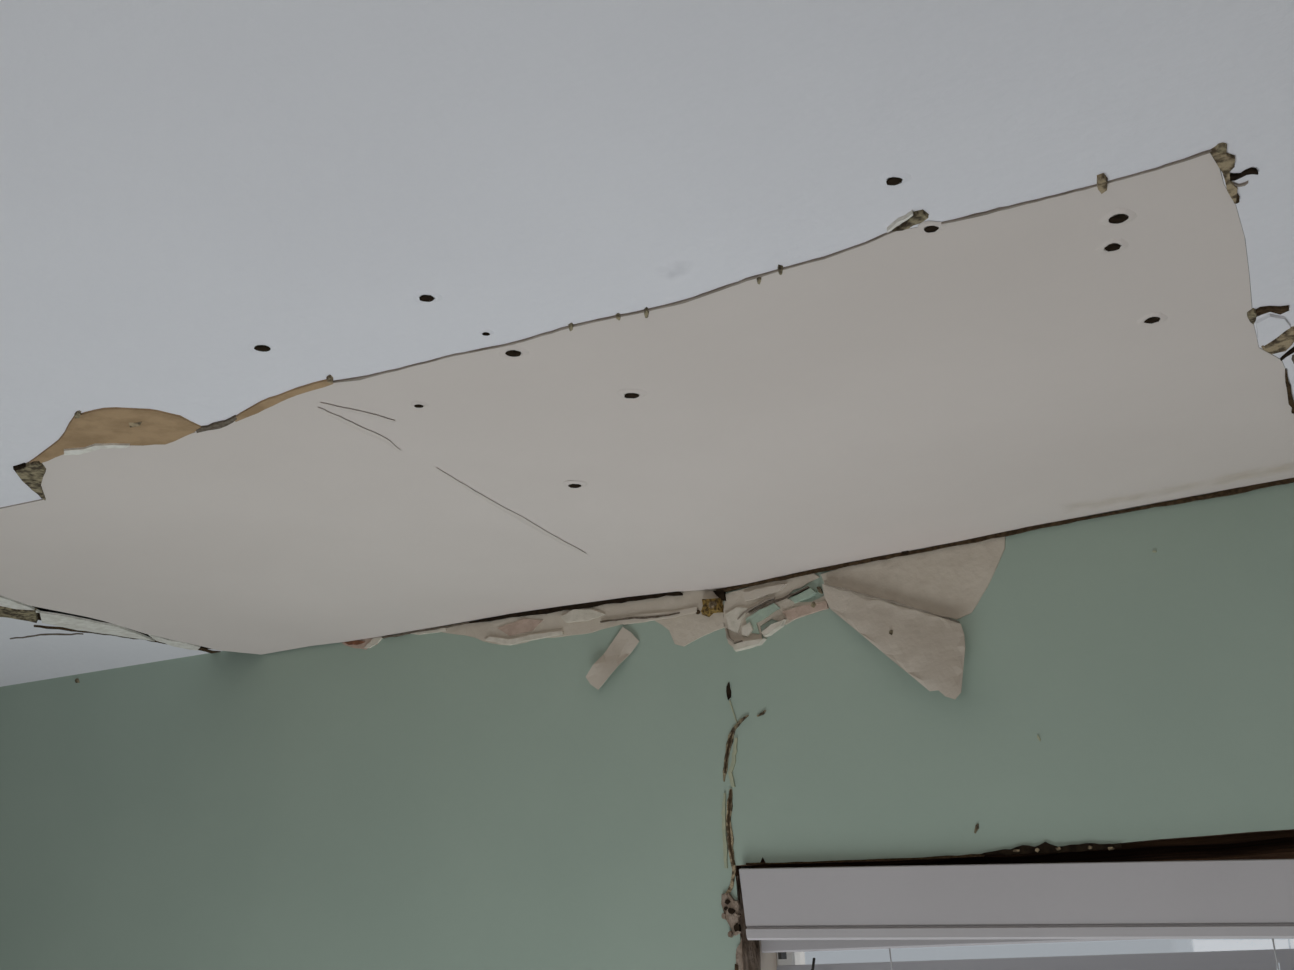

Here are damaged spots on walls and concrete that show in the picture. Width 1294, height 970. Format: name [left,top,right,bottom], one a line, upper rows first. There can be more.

peeling [1097,173,1108,194]
spalling [1210,142,1258,204]
spalling [887,210,929,233]
spalling [1247,305,1294,363]
crack [1280,347,1294,414]
crack [0,595,221,653]
peeling [342,637,383,650]
peeling [404,537,1006,690]
crack [721,682,985,894]